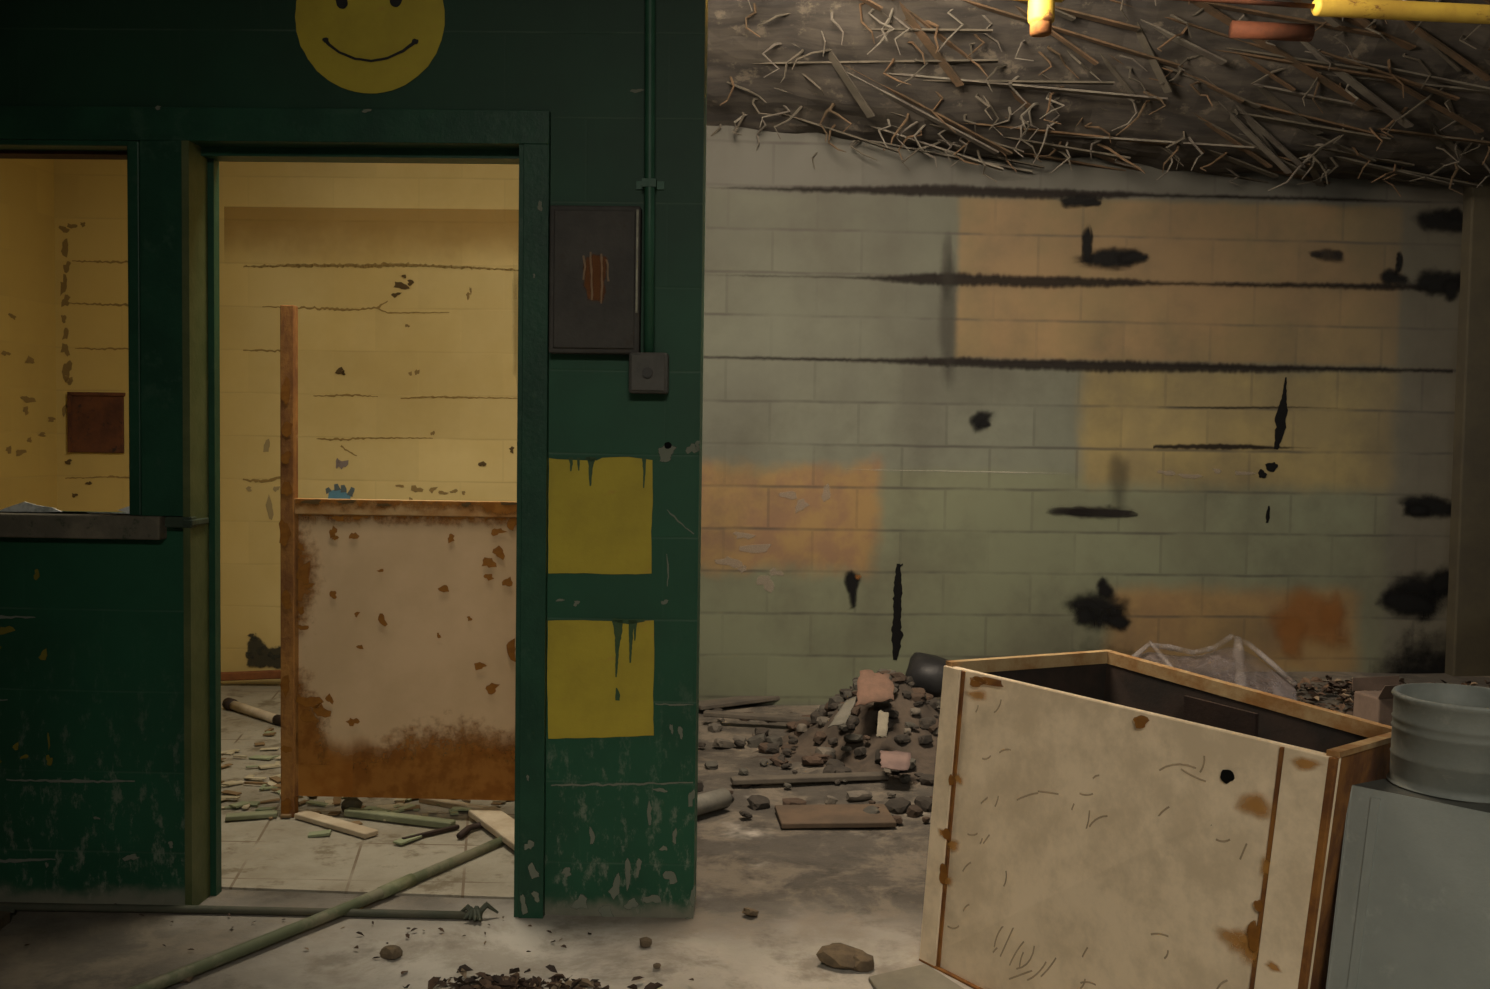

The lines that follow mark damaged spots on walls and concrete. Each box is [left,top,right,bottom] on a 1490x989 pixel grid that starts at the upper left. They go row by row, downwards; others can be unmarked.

water stain [1082,227,1093,262]
peeling [59,222,85,385]
spalling [391,275,414,298]
corrosion [583,254,607,301]
crack [751,357,1453,450]
crack [891,564,903,660]
water stain [1076,578,1130,630]
water stain [1379,571,1449,614]
corrosion [474,662,499,694]
corrosion [280,675,515,814]
peeling [520,840,539,915]
peeling [571,858,696,919]